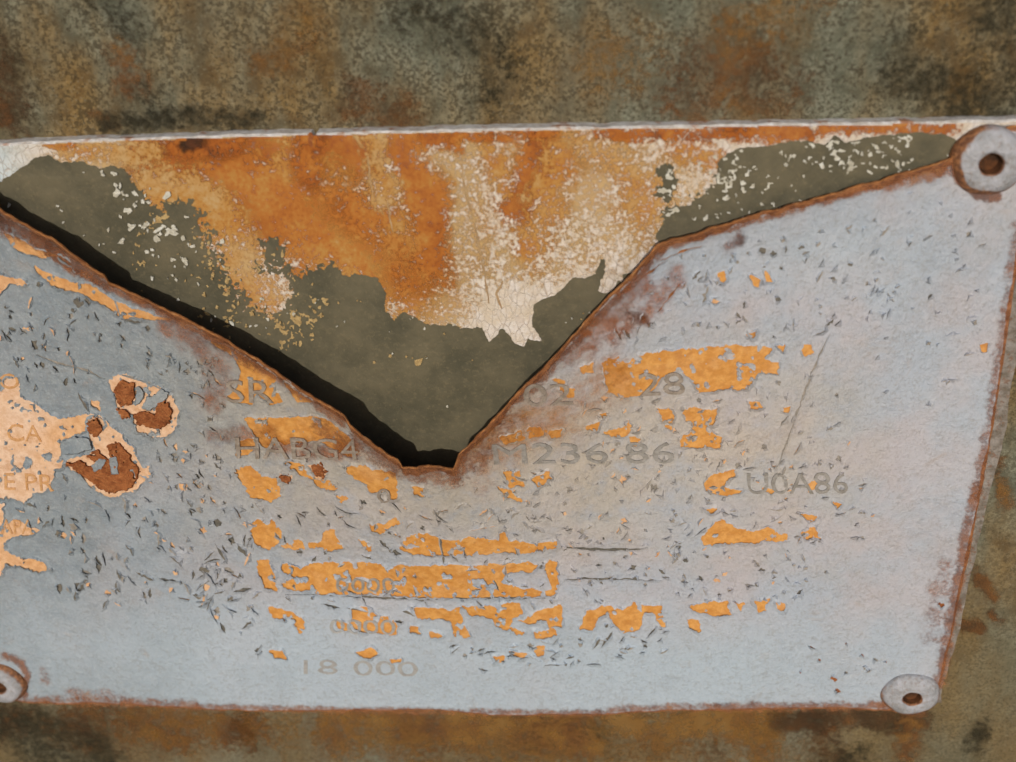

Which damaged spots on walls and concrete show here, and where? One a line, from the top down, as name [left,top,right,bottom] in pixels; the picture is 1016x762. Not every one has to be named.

spalling [179,138,207,153]
rust [0,79,963,500]
peeling [653,132,957,243]
peeling [816,218,901,323]
peeling [951,217,986,273]
rust [969,192,1001,202]
peeling [964,340,991,356]
peeling [0,155,875,675]
rust [0,653,933,762]